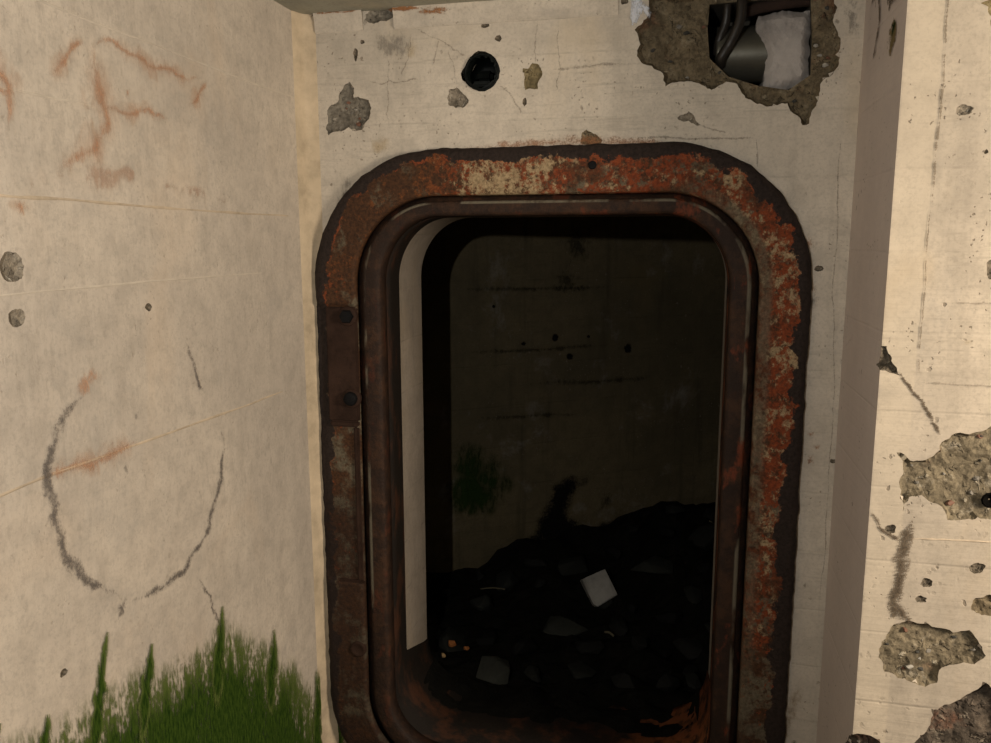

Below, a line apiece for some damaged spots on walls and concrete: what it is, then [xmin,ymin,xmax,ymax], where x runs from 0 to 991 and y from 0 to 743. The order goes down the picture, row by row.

spalling [326,82,371,135]
spalling [635,0,841,126]
crack [900,0,949,433]
water stain [43,402,102,589]
spalling [897,426,991,520]
water stain [90,632,108,743]
water stain [138,643,155,743]
water stain [204,589,226,705]
water stain [313,671,323,743]
spalling [846,734,880,743]
spalling [879,621,986,687]
spalling [914,682,991,743]